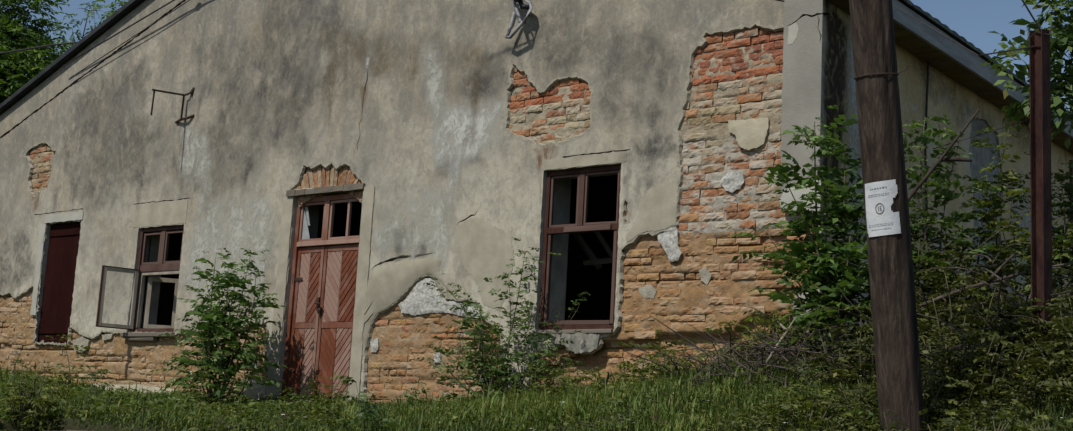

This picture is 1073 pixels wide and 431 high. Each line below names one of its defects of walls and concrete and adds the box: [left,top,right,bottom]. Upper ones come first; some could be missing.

flaking render [23,141,57,199]
flaking render [0,278,269,401]
water stain [178,123,273,312]
flaking render [289,161,363,210]
water stain [374,49,501,264]
flaking render [360,217,515,403]
flaking render [503,62,594,150]
flaking render [524,20,826,393]